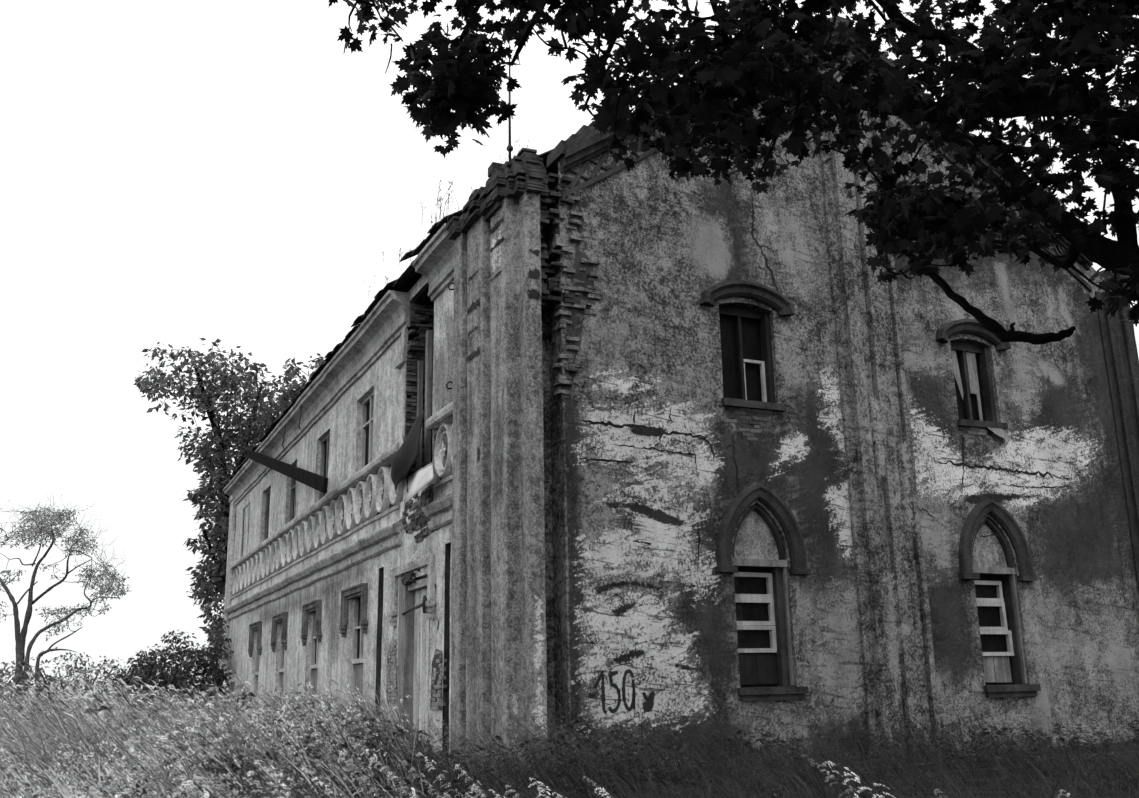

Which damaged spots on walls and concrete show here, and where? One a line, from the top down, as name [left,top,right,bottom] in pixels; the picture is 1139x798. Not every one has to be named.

crack [578,407,740,493]
water stain [565,383,869,762]
crack [933,432,1072,491]
water stain [894,220,1139,703]